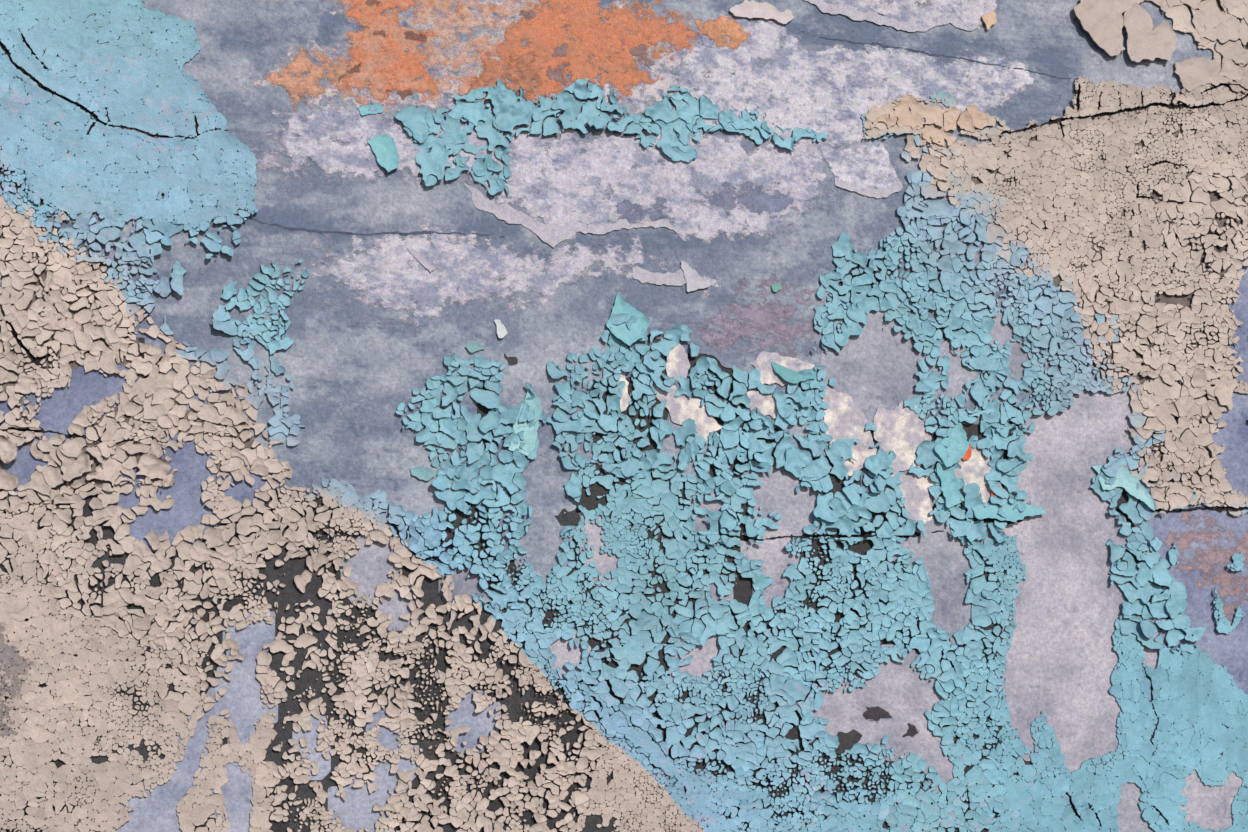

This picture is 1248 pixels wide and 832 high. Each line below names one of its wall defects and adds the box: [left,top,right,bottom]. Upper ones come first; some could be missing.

crack [0,29,227,139]
corrosion [266,0,750,112]
crack [800,31,1248,138]
peeling [394,73,828,195]
peeling [946,121,995,147]
peeling [463,182,686,248]
peeling [835,177,903,198]
peeling [632,266,686,286]
peeling [680,261,711,292]
peeling [494,319,508,338]
peeling [280,667,295,690]
peeling [1175,766,1247,831]